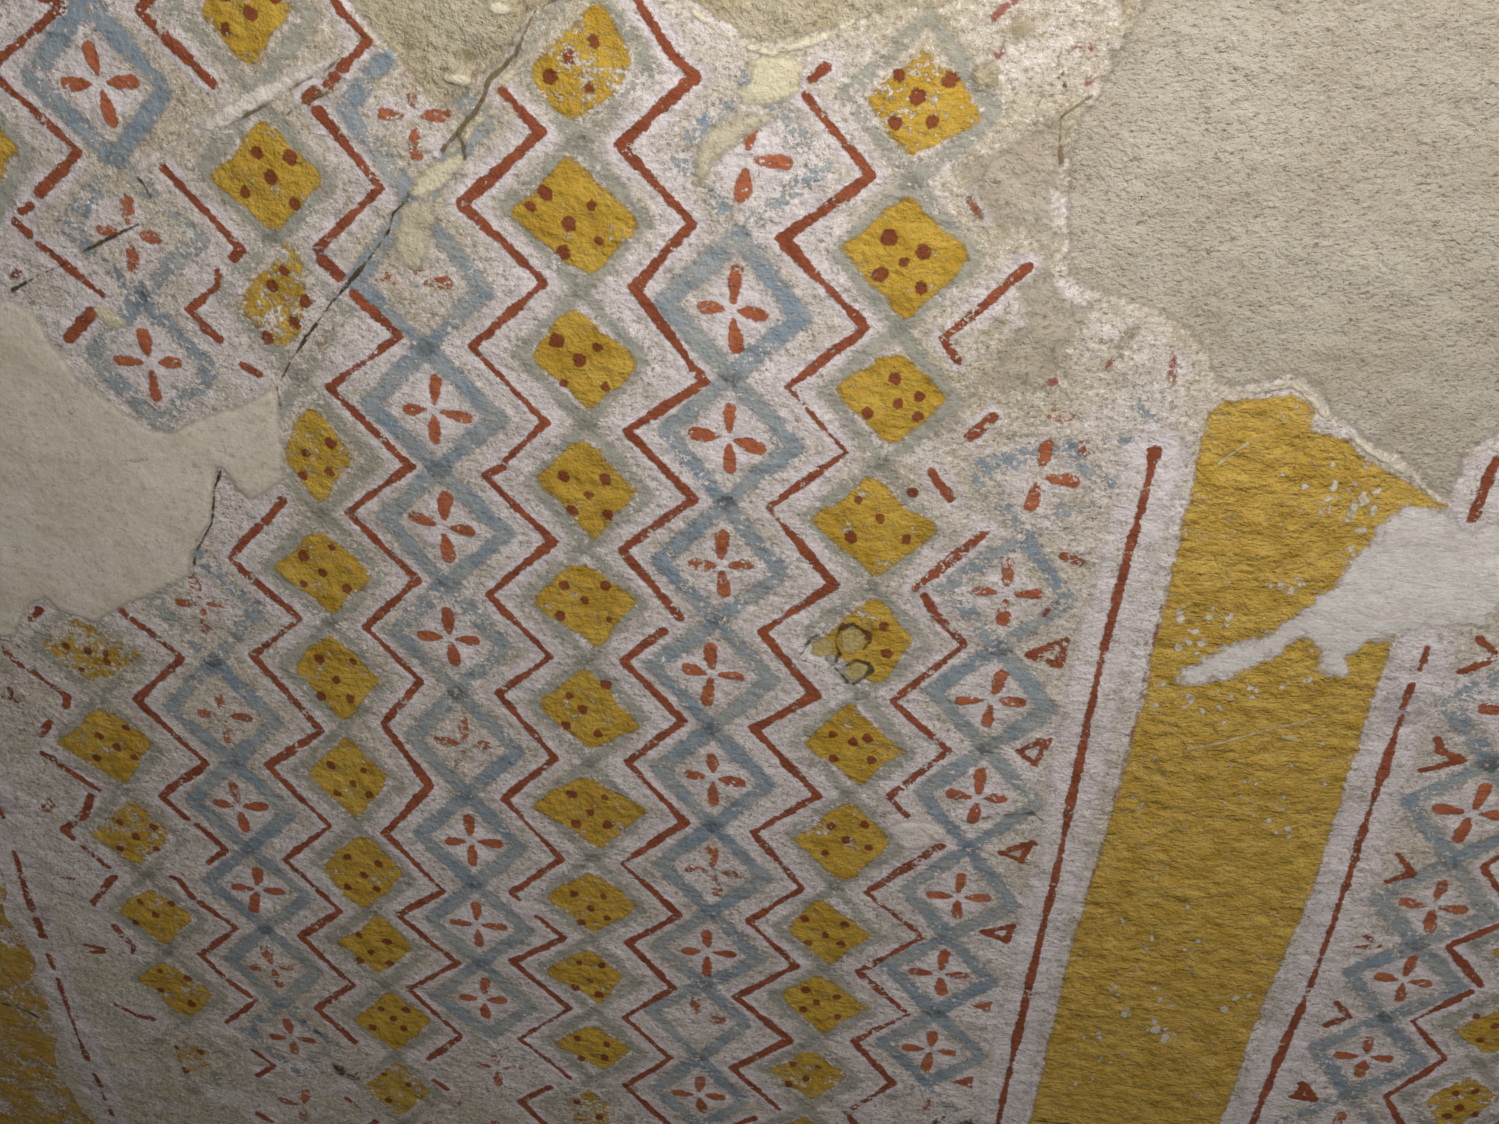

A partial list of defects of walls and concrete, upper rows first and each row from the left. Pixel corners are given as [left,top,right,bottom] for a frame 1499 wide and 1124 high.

spalling [690,0,953,56]
crack [242,59,338,118]
crack [441,0,556,159]
crack [277,187,405,409]
peeling [1298,462,1382,558]
peeling [1268,575,1317,595]
spalling [805,623,875,685]
peeling [1174,606,1235,655]
peeling [1150,680,1259,714]
peeling [1243,780,1292,839]